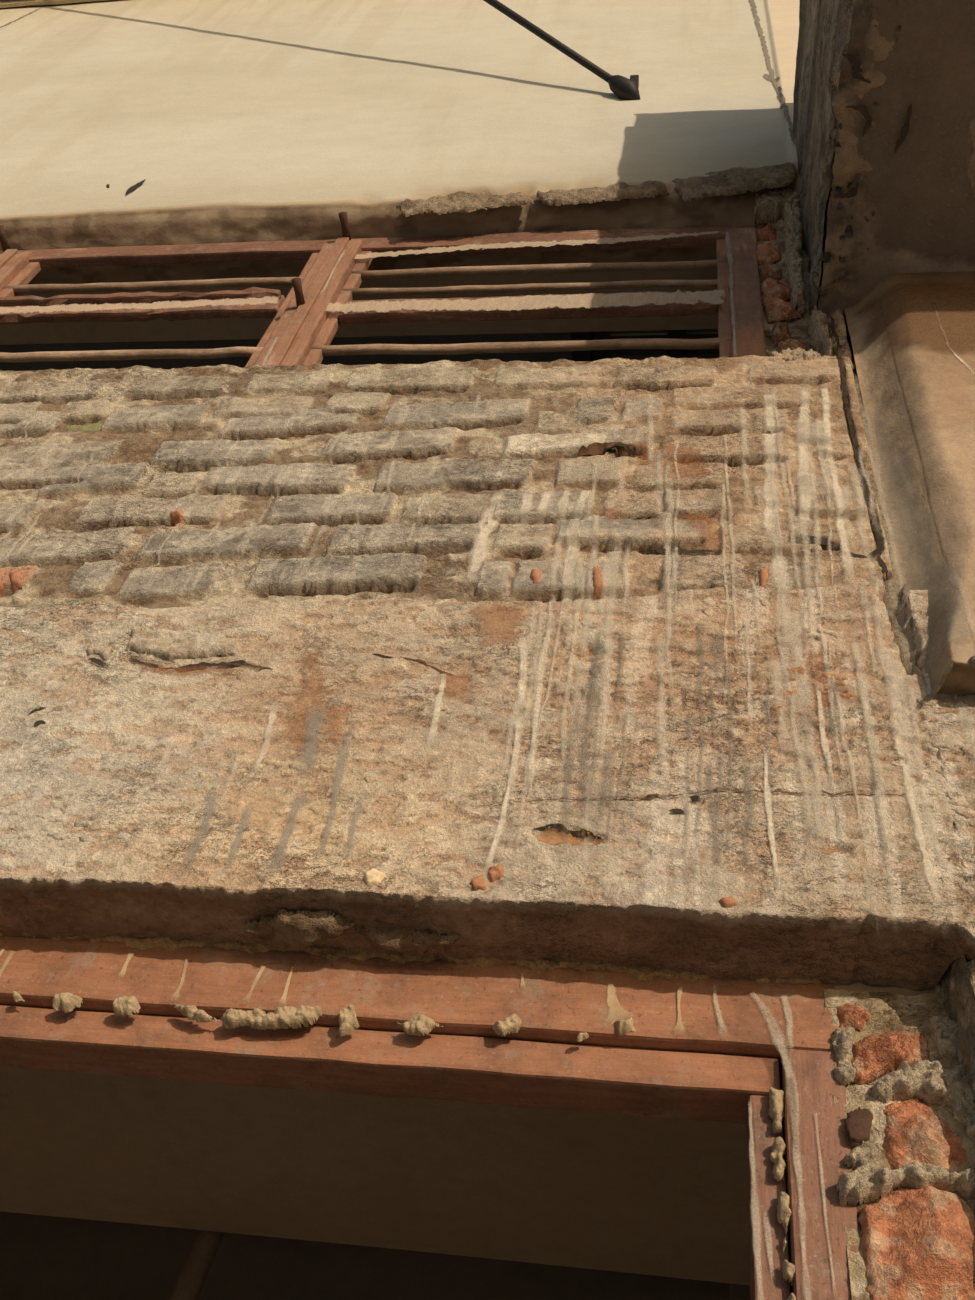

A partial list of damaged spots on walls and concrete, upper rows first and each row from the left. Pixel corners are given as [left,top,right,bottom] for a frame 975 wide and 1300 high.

spalling [817,123,875,297]
damp [862,282,975,365]
crack [88,658,272,674]
damp [469,495,501,575]
damp [648,406,679,752]
damp [721,408,746,597]
crack [794,316,892,595]
damp [745,382,970,889]
spalling [534,823,601,846]